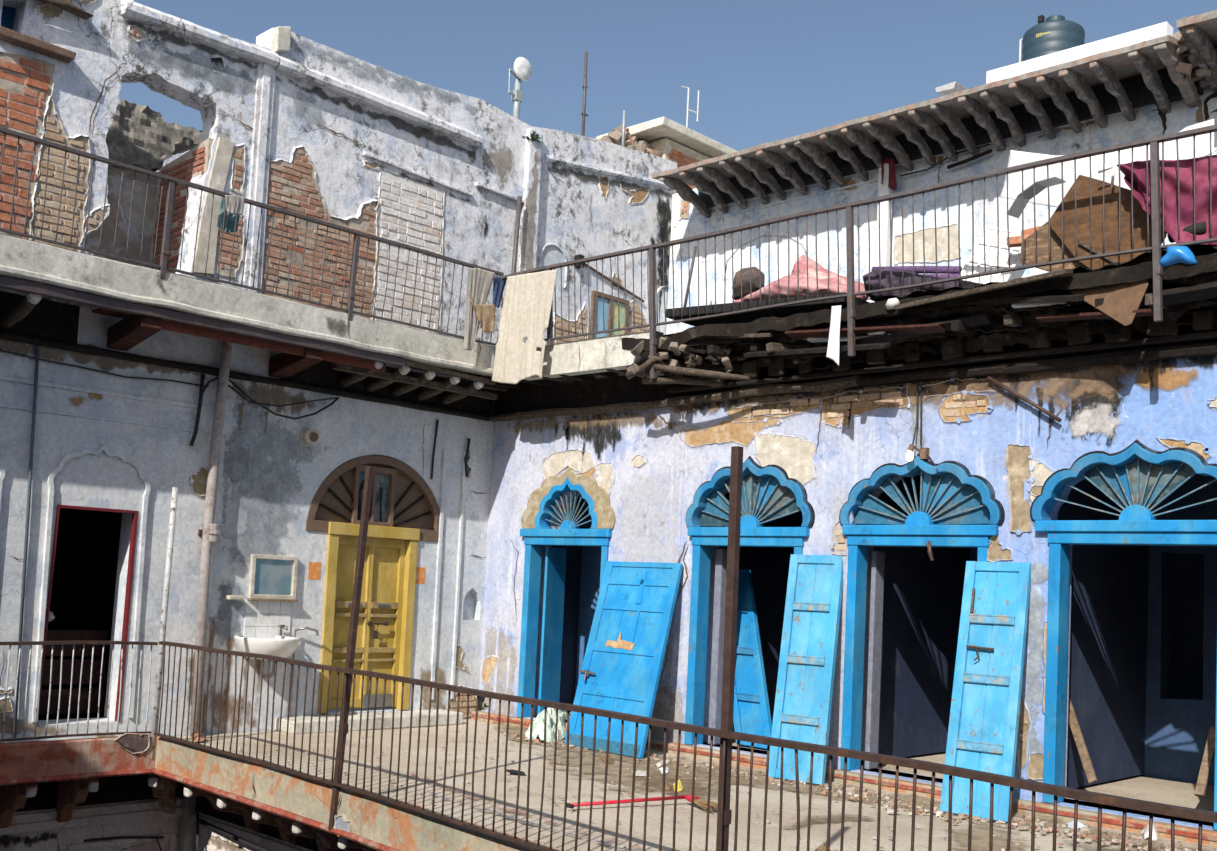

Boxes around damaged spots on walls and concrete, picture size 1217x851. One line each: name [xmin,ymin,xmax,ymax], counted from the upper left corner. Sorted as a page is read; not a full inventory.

crack [1204,92,1217,121]
spalling [0,51,206,273]
spalling [261,145,443,334]
damp [519,150,671,323]
spalling [542,448,616,497]
spalling [631,454,648,468]
peeling [679,378,998,486]
damp [508,355,1216,461]
spalling [987,442,1057,562]
spalling [1156,437,1213,462]
spalling [1016,620,1047,782]